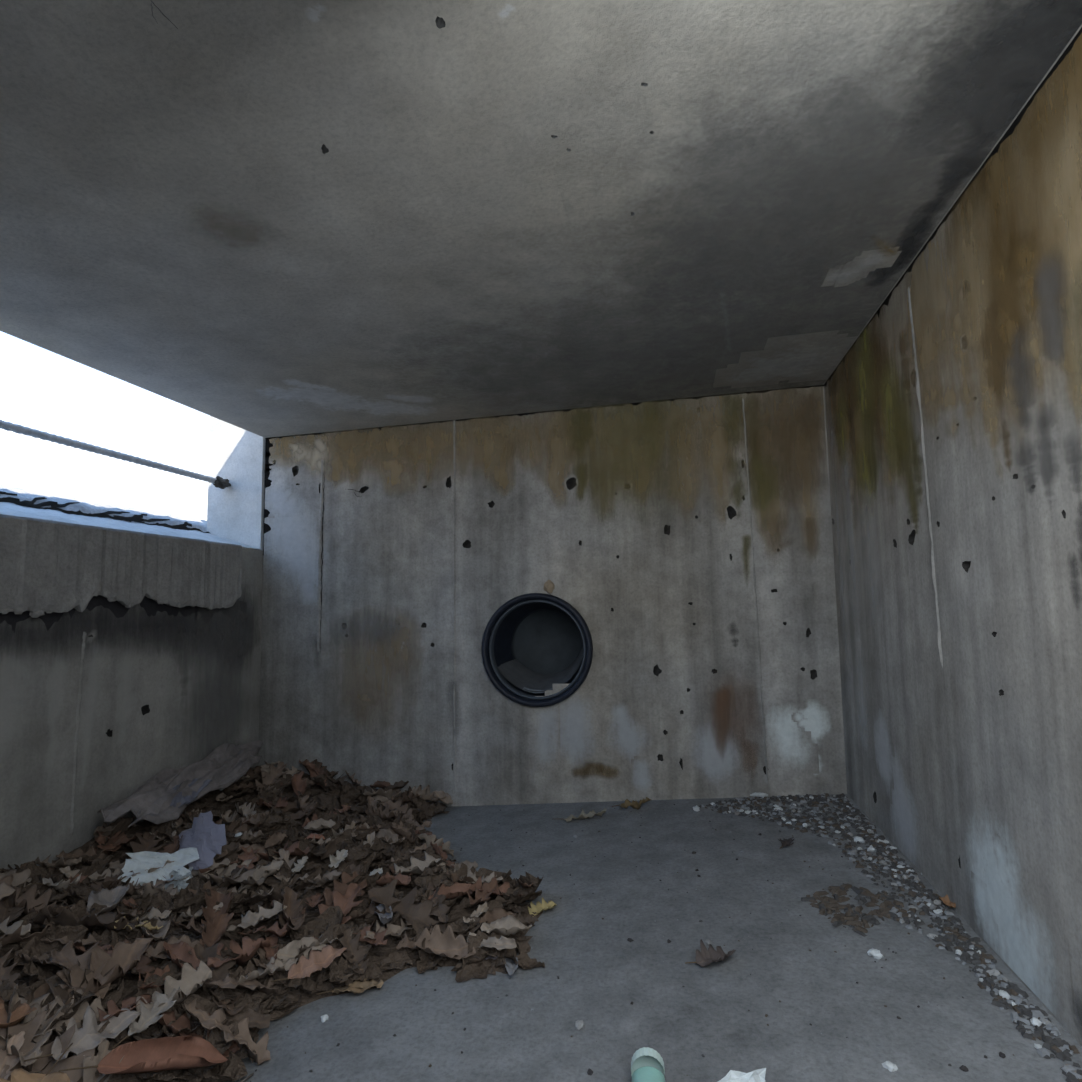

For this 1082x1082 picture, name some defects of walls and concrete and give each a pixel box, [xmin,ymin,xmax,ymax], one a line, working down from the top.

water stain [530,0,1082,538]
water stain [234,377,519,491]
water stain [263,482,346,609]
peeling [2,607,56,618]
water stain [525,684,663,801]
water stain [681,695,833,799]